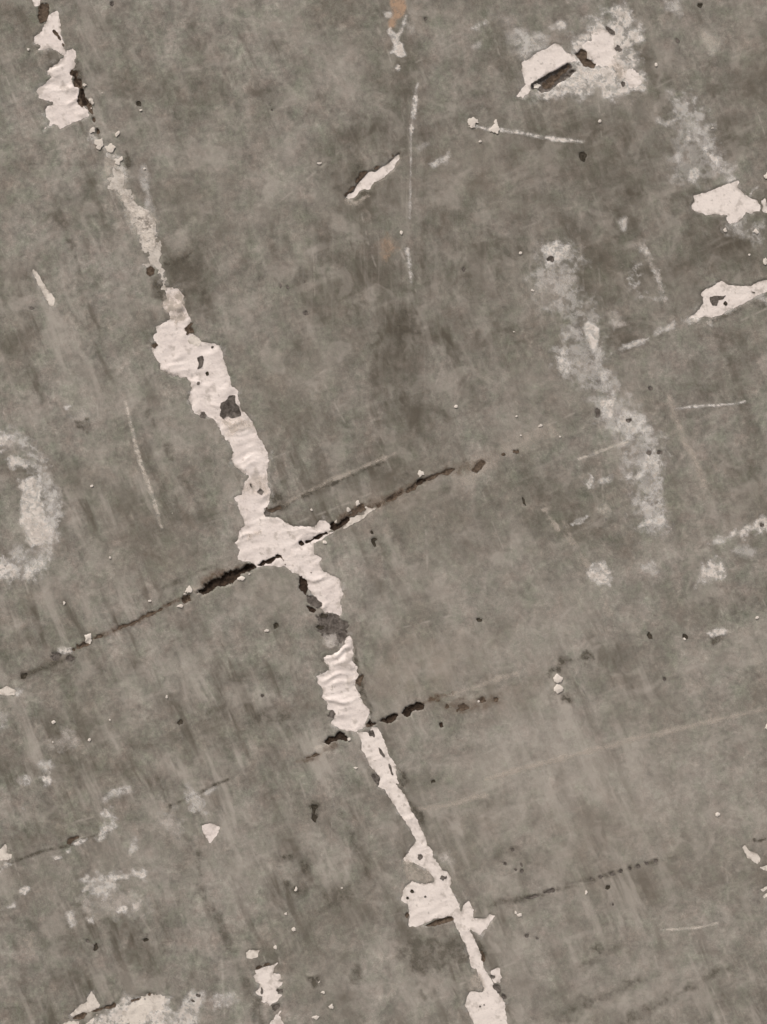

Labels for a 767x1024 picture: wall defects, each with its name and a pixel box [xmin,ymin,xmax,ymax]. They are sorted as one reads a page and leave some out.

spalling [517,6,645,100]
peeling [691,178,767,232]
peeling [689,280,767,324]
peeling [32,0,508,1024]
crack [21,450,519,679]